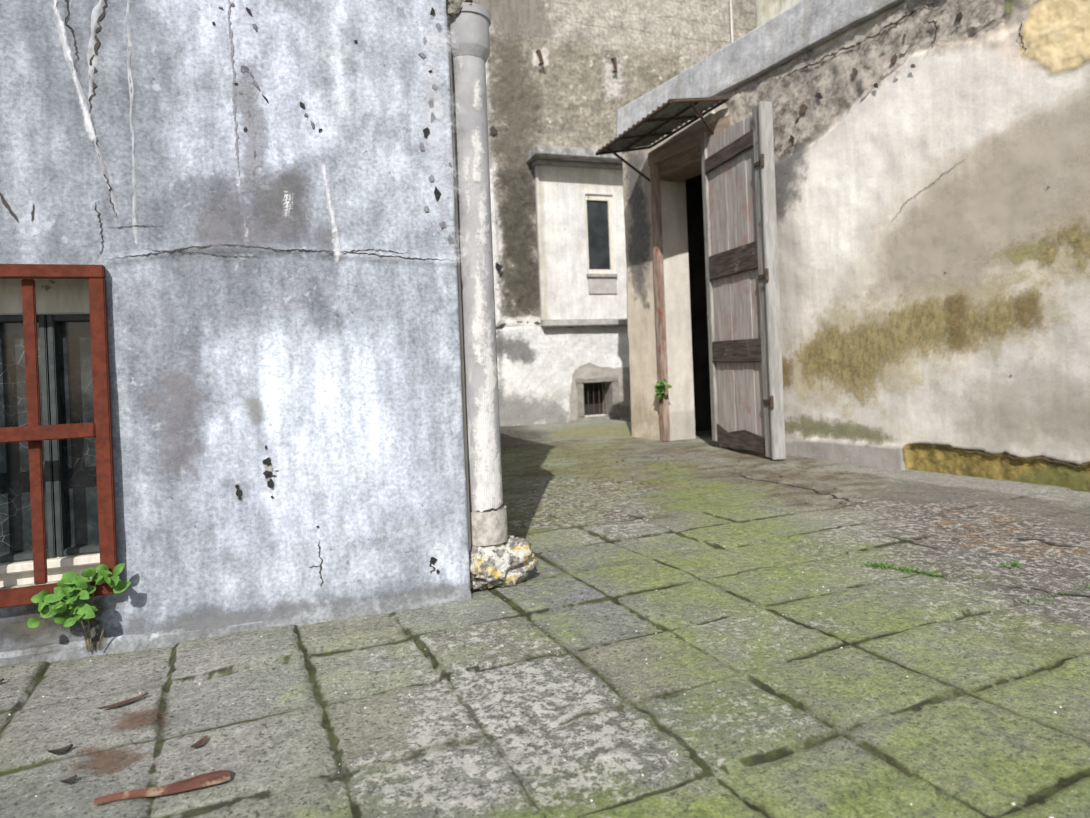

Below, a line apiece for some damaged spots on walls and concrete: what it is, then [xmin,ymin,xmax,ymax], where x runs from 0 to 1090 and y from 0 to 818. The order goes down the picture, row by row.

peeling [731,0,1090,159]
water stain [475,0,549,318]
water stain [889,102,1090,279]
crack [94,203,447,260]
water stain [496,329,535,363]
water stain [782,357,793,389]
spalling [263,445,278,499]